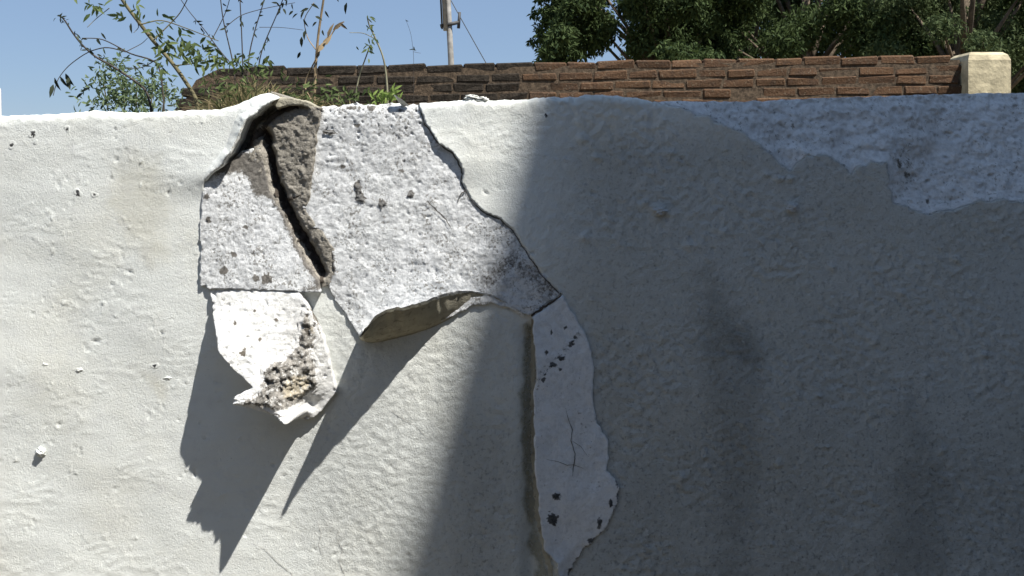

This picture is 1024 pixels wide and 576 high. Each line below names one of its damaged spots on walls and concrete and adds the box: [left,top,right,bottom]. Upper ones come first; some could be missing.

flaking render [199,91,338,424]
crack [244,106,326,283]
spalling [657,93,1024,215]
flaking render [532,295,620,576]